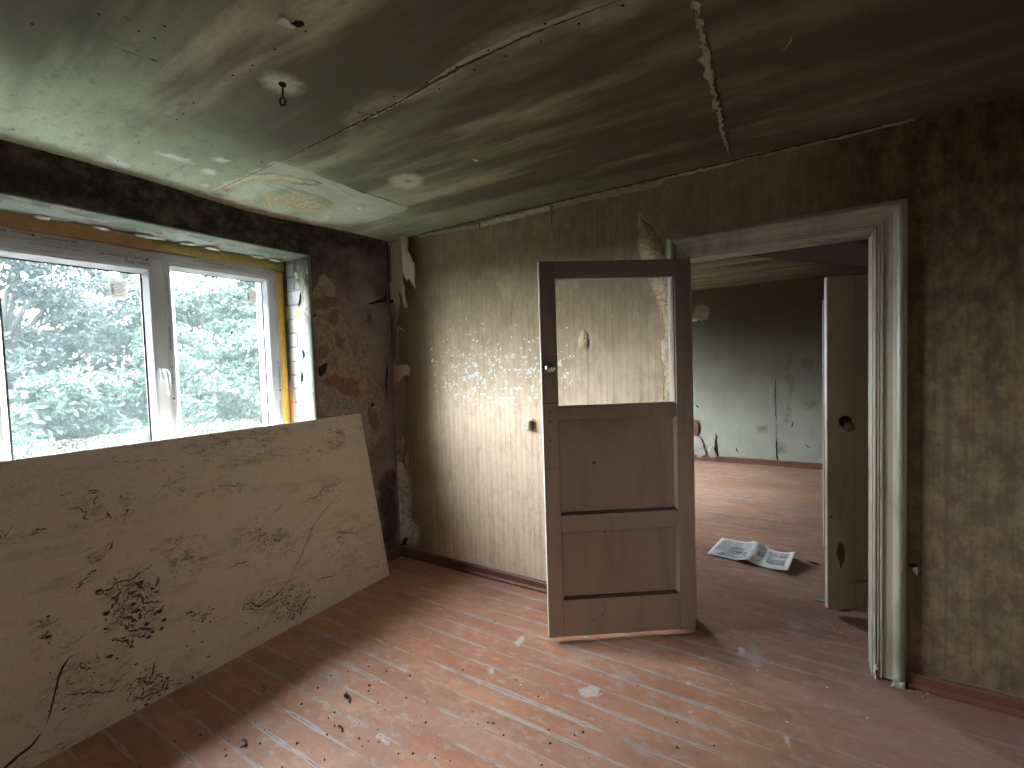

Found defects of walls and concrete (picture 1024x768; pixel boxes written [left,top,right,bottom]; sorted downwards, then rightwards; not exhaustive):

crack [215,0,881,234]
peeling [0,197,389,449]
damp [428,323,541,410]
crack [775,379,809,460]